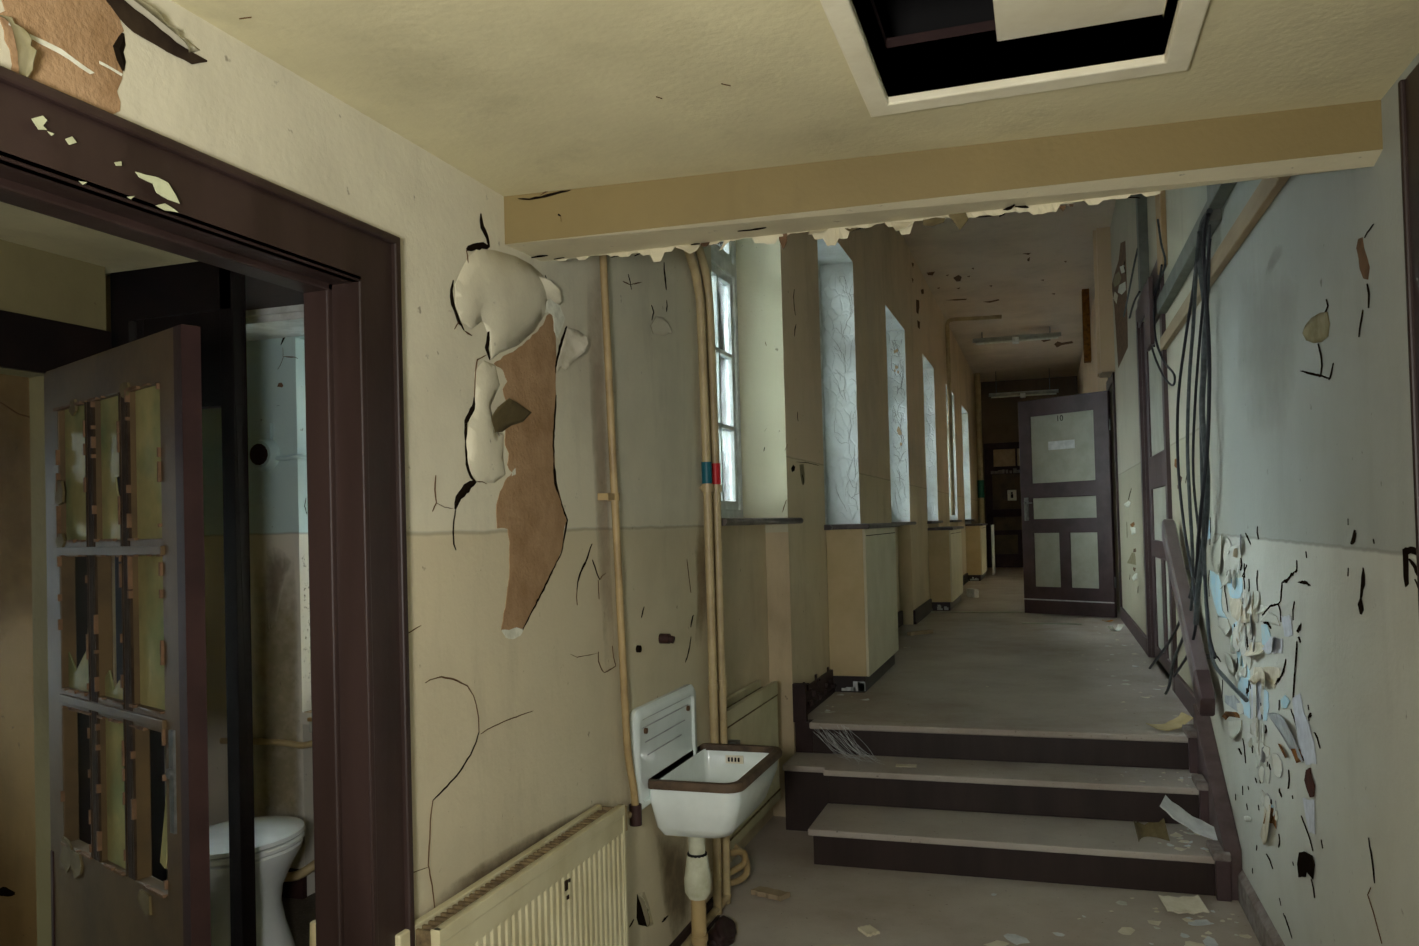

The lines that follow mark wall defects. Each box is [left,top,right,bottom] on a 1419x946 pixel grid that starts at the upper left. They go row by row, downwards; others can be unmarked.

peeling [0,0,207,114]
peeling [32,116,77,145]
peeling [114,161,180,213]
crack [610,227,766,312]
peeling [548,191,1161,262]
crack [976,204,1029,218]
crack [432,213,490,550]
peeling [492,276,588,639]
crack [523,326,606,629]
crack [685,562,694,663]
peeling [1207,517,1323,898]
crack [414,676,532,908]